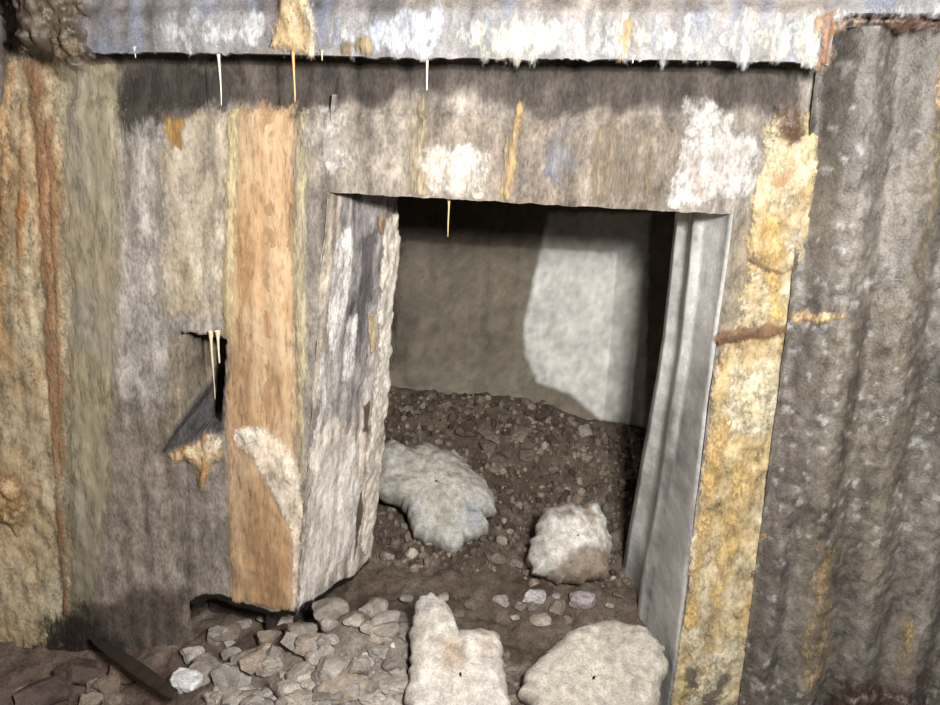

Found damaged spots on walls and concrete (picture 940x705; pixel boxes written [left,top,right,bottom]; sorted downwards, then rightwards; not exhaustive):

leakage [329,6,824,69]
corrosion [814,5,940,72]
corrosion [500,101,523,200]
leakage [747,206,786,323]
corrosion [222,103,309,610]